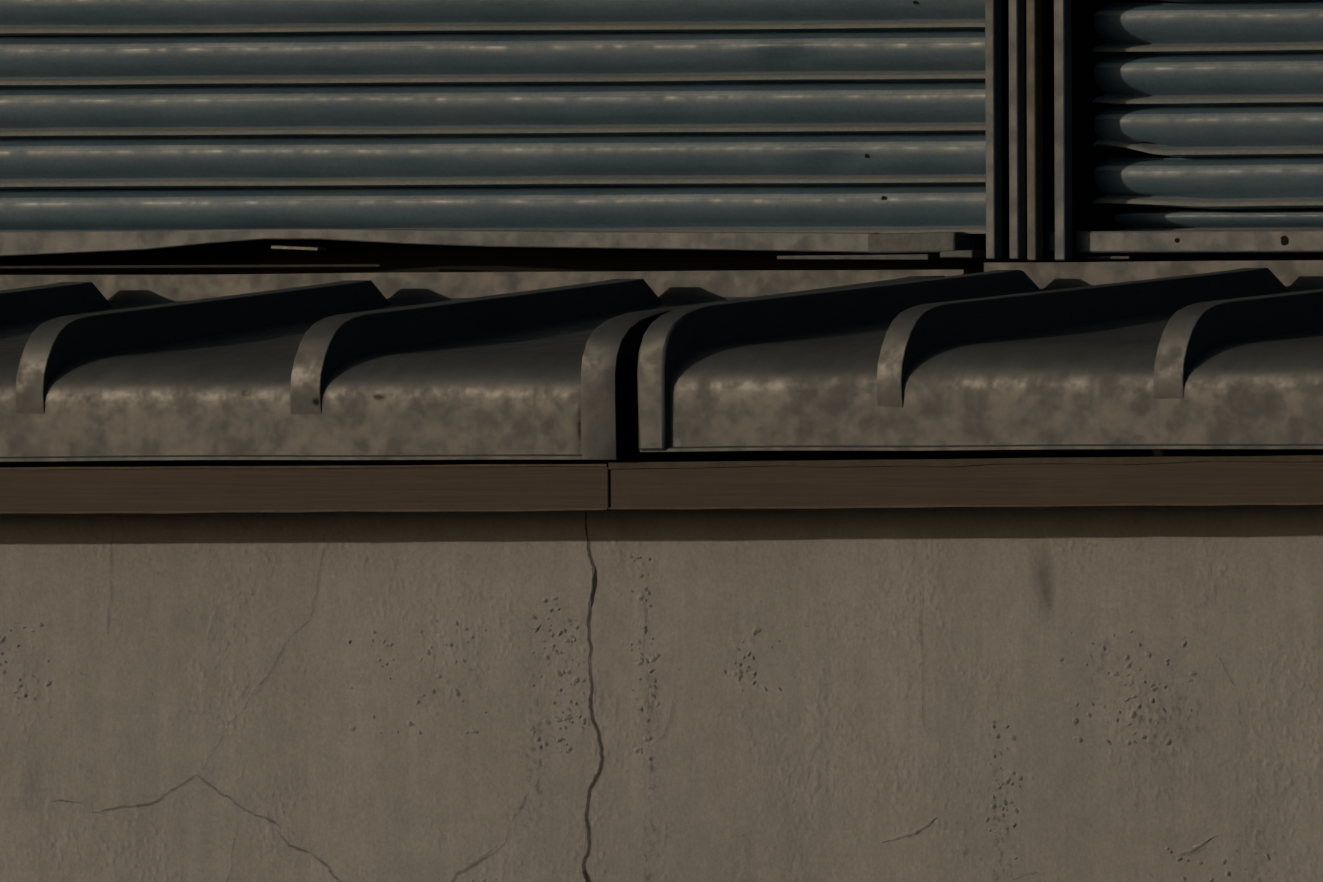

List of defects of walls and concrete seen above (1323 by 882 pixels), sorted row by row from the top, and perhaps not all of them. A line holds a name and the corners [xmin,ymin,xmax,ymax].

crack [581,511,603,882]